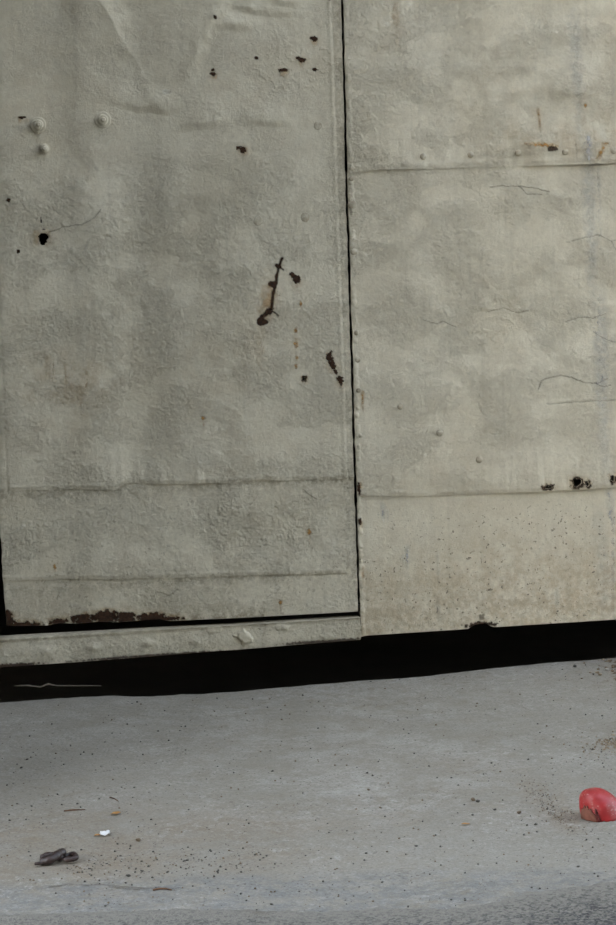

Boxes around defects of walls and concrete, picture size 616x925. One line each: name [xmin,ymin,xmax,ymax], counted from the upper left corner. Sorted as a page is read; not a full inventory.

corrosion [257,257,301,326]
corrosion [326,350,344,386]
corrosion [6,609,185,626]